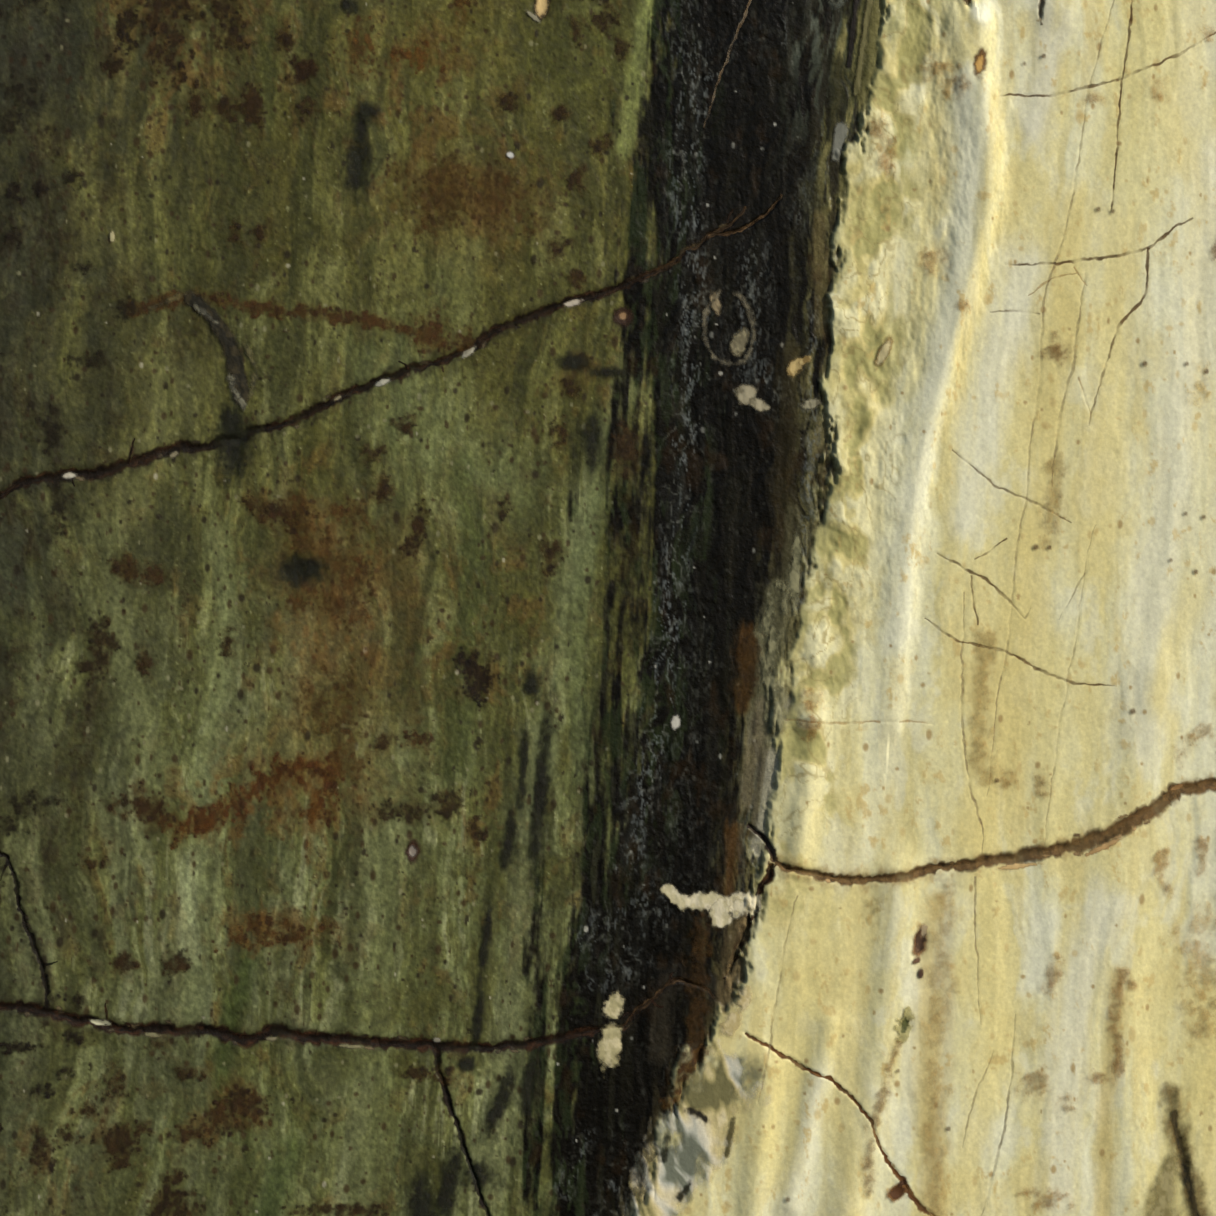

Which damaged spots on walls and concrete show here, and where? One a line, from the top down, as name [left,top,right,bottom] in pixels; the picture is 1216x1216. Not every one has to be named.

rust [101,0,267,127]
rust [278,25,318,83]
crack [1007,5,1175,210]
crack [0,194,783,499]
crack [1018,222,1185,358]
crack [925,538,1041,671]
rust [108,714,357,850]
crack [0,778,1216,1216]